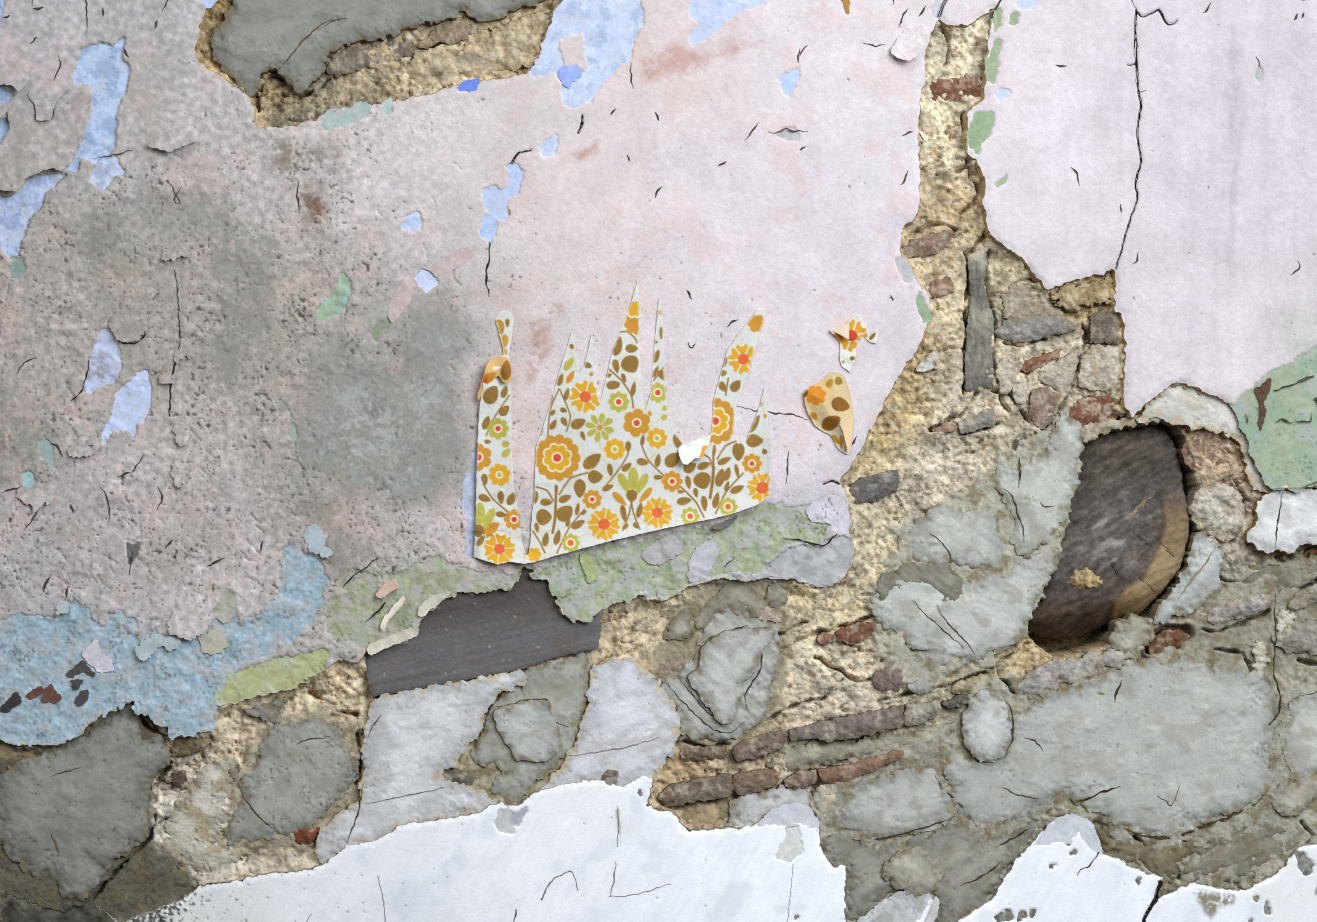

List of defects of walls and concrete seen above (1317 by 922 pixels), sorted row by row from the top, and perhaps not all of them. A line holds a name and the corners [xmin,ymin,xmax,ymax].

peeling [0,38,130,279]
peeling [457,77,480,93]
peeling [530,0,644,108]
peeling [689,0,764,46]
peeling [891,0,946,61]
peeling [966,0,1037,155]
crack [1117,1,1211,266]
peeling [1229,346,1317,493]
peeling [0,449,854,747]
crack [1143,880,1163,922]
spalling [1248,895,1271,922]
spalling [1293,849,1315,876]